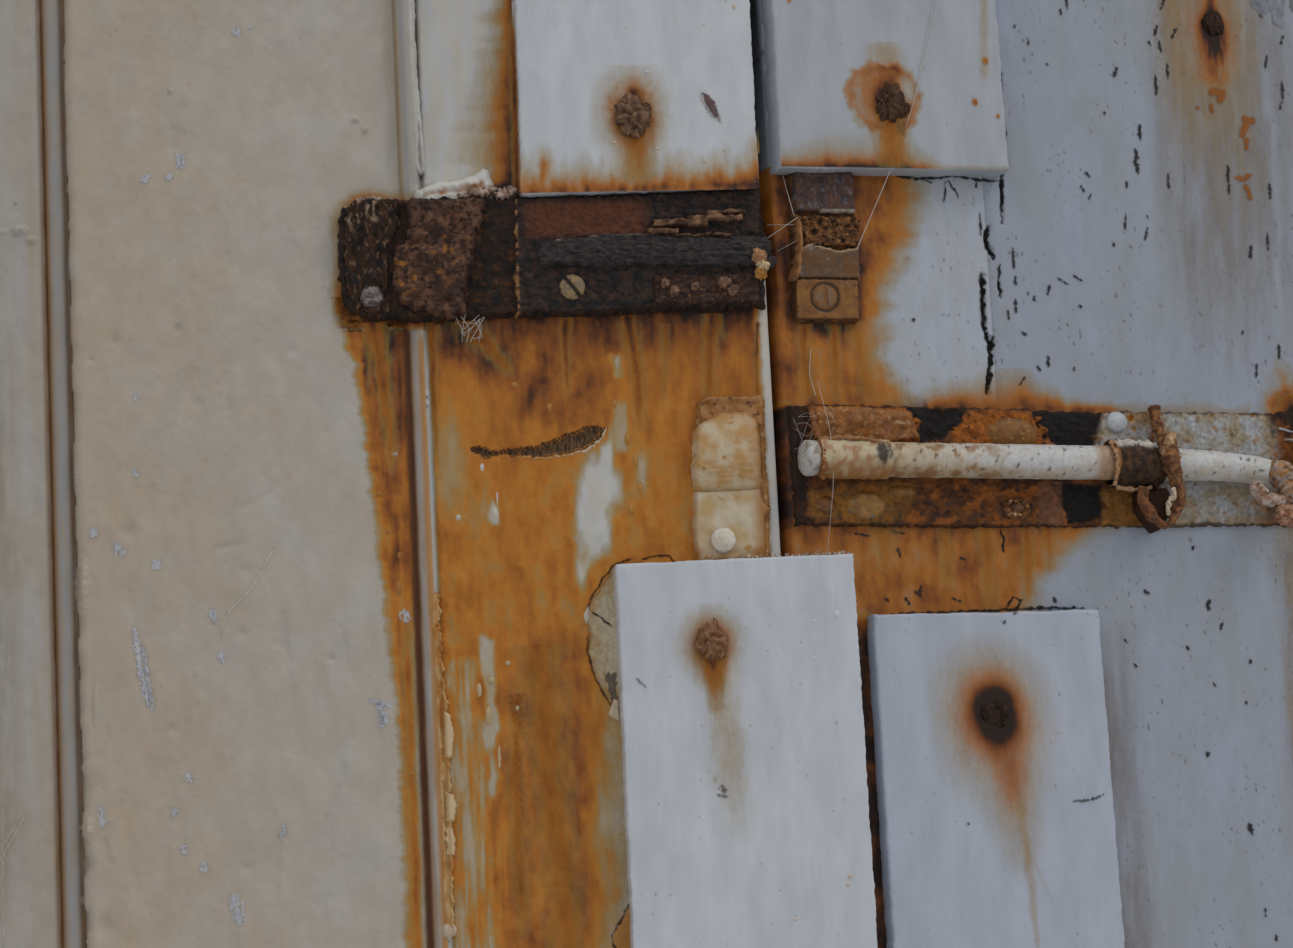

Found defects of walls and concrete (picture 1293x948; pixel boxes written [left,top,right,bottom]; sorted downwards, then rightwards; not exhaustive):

corrosion [1192,0,1233,113]
corrosion [1240,115,1255,150]
corrosion [1235,173,1253,200]
corrosion [1266,376,1293,414]
corrosion [334,0,1122,948]